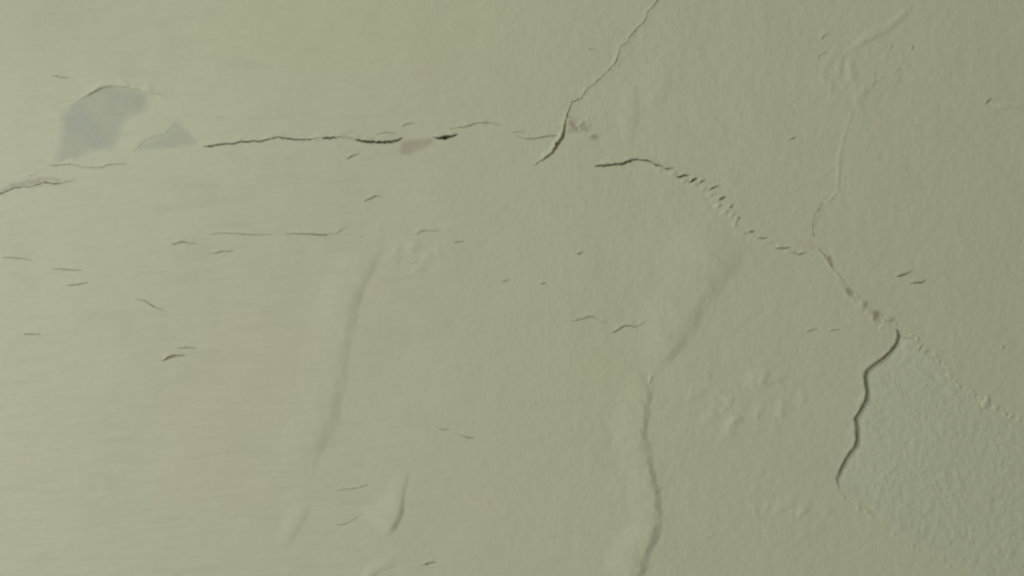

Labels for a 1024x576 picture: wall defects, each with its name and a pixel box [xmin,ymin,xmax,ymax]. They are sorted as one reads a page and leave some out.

crack [431,0,661,165]
peeling [53,76,200,165]
crack [202,129,404,149]
crack [0,158,126,199]
crack [209,225,363,237]
crack [571,311,646,334]
crack [594,155,900,478]